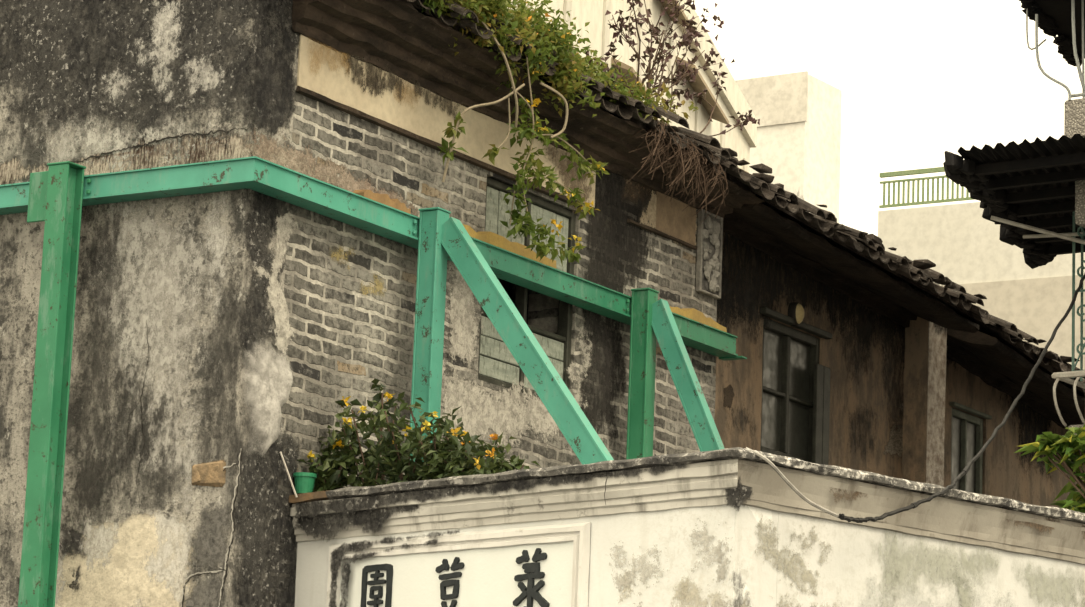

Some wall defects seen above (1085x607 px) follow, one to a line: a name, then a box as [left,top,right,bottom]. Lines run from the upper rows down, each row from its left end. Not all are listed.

damp [0,0,300,172]
crack [70,127,252,162]
damp [59,189,685,607]
damp [843,321,905,454]
peeling [609,545,668,607]
peeling [671,518,732,607]
peeling [755,518,842,607]